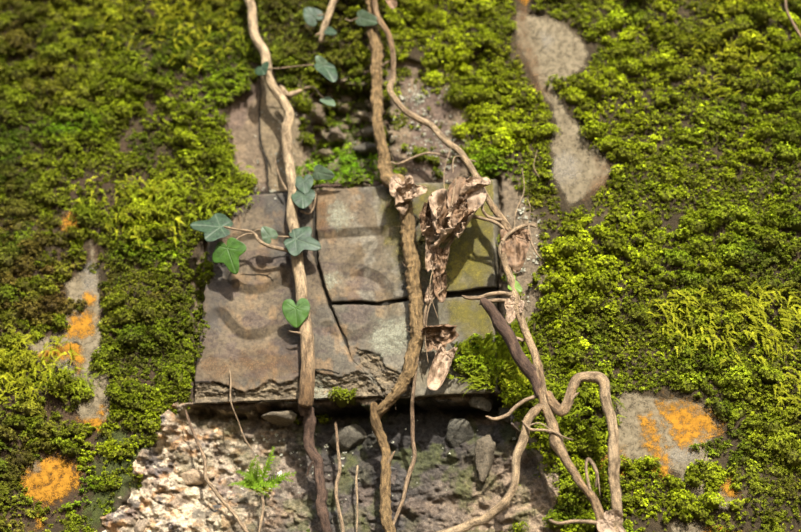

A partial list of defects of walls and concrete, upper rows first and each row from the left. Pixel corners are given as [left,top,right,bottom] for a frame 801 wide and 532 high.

crack [249,76,288,195]
crack [312,205,497,350]
spalling [94,350,566,532]